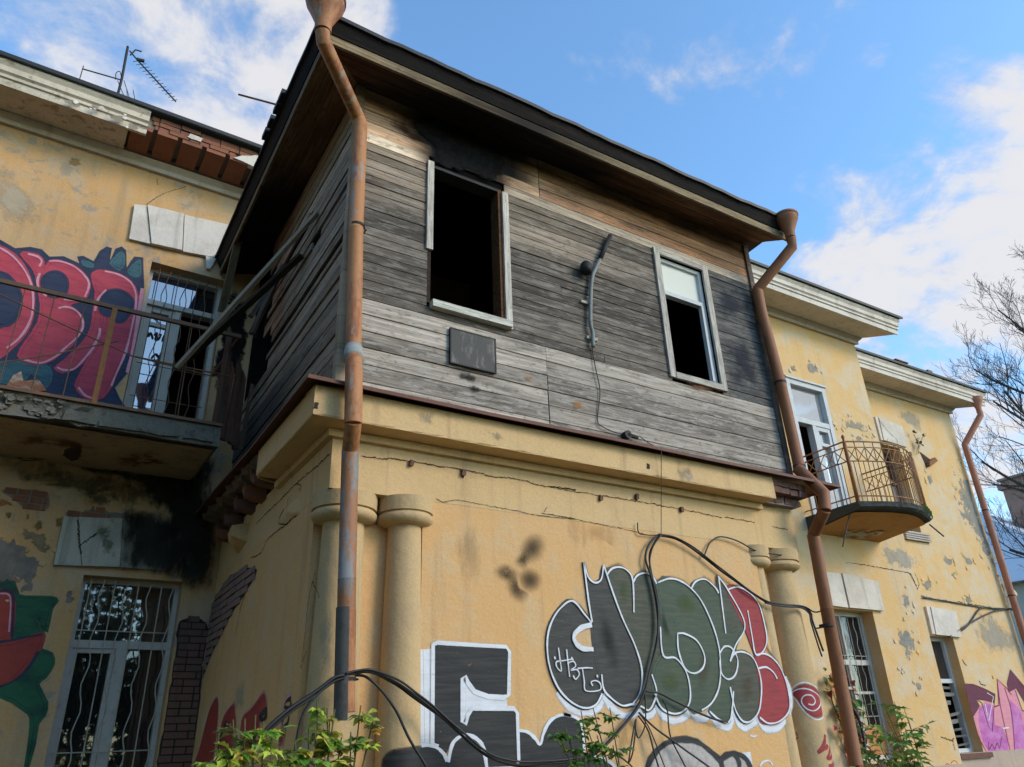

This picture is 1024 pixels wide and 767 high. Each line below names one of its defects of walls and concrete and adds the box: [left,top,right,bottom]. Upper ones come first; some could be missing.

peeling [789,359,823,373]
peeling [833,414,876,441]
peeling [0,487,57,593]
crack [77,520,97,554]
damp [19,463,214,588]
crack [251,454,330,558]
damp [502,542,537,594]
crack [362,455,788,534]
peeling [885,548,922,568]
peeling [894,585,923,696]
peeling [981,619,1014,648]